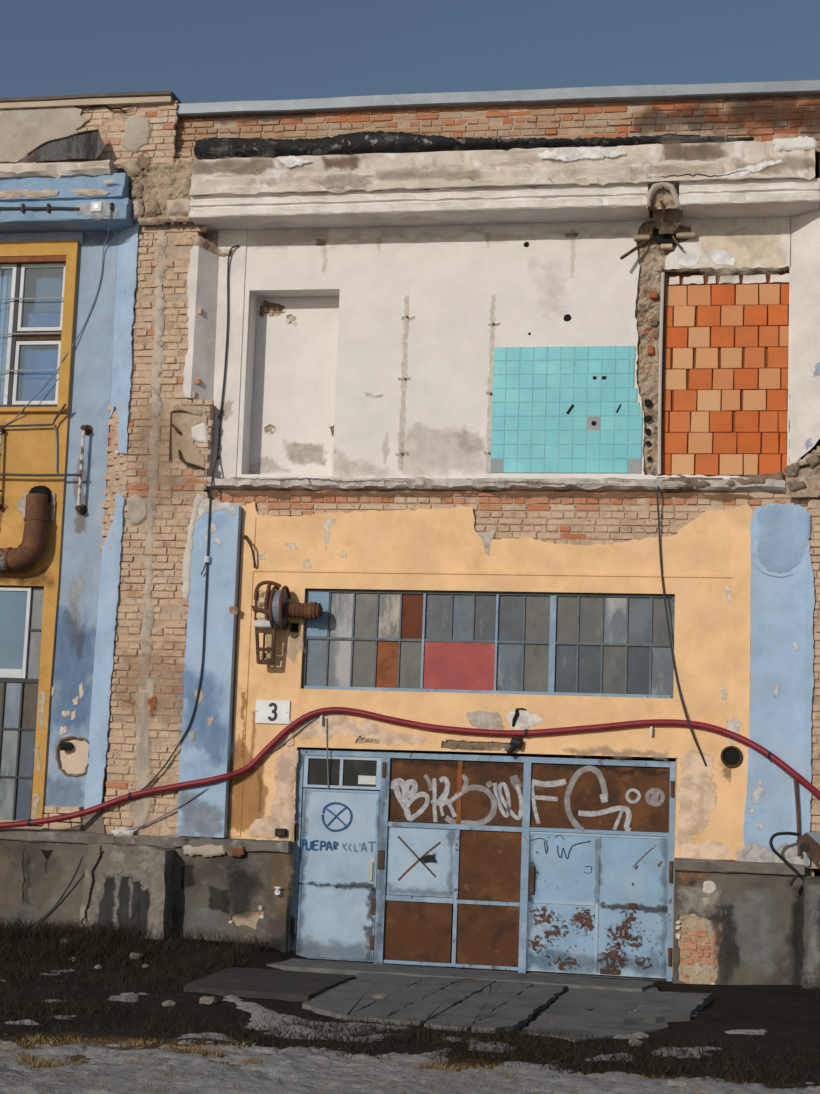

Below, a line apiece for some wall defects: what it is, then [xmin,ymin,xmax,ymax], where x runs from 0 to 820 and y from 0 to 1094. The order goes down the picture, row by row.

flaking render [101,408,148,549]
flaking render [441,710,543,752]
peeling [182,713,425,857]
peeling [675,750,739,861]
crack [81,846,104,925]
water stain [82,864,150,937]
peeling [146,852,165,939]
flaking render [229,905,264,929]
rust [528,906,663,975]
flaking render [675,881,724,985]
water stain [789,886,820,988]